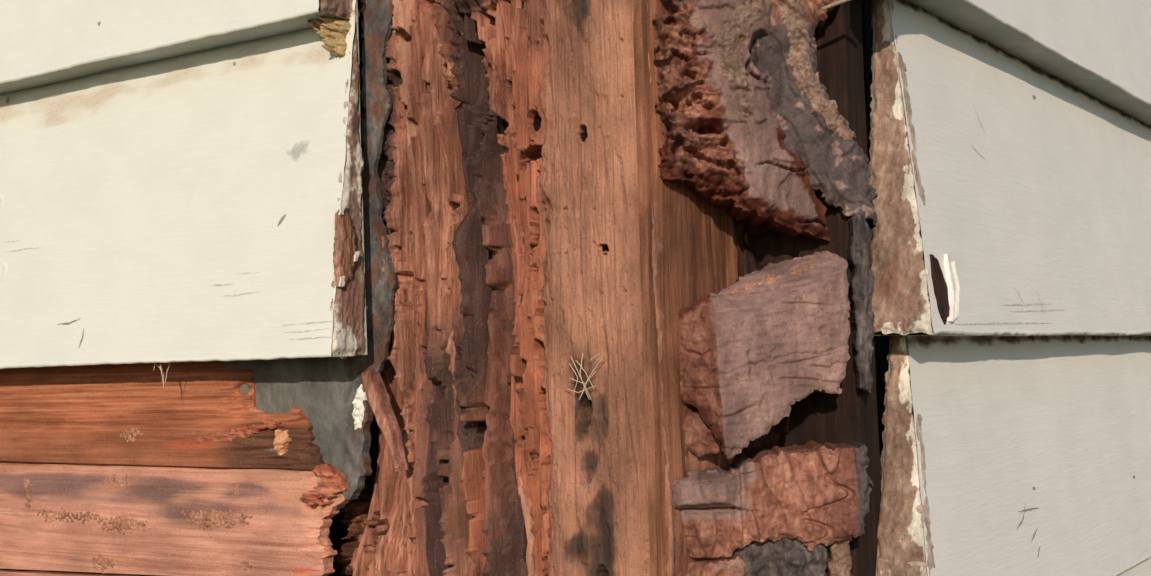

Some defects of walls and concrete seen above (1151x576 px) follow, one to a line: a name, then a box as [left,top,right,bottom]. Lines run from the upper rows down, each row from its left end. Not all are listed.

peeling [894,52,926,205]
peeling [333,202,360,289]